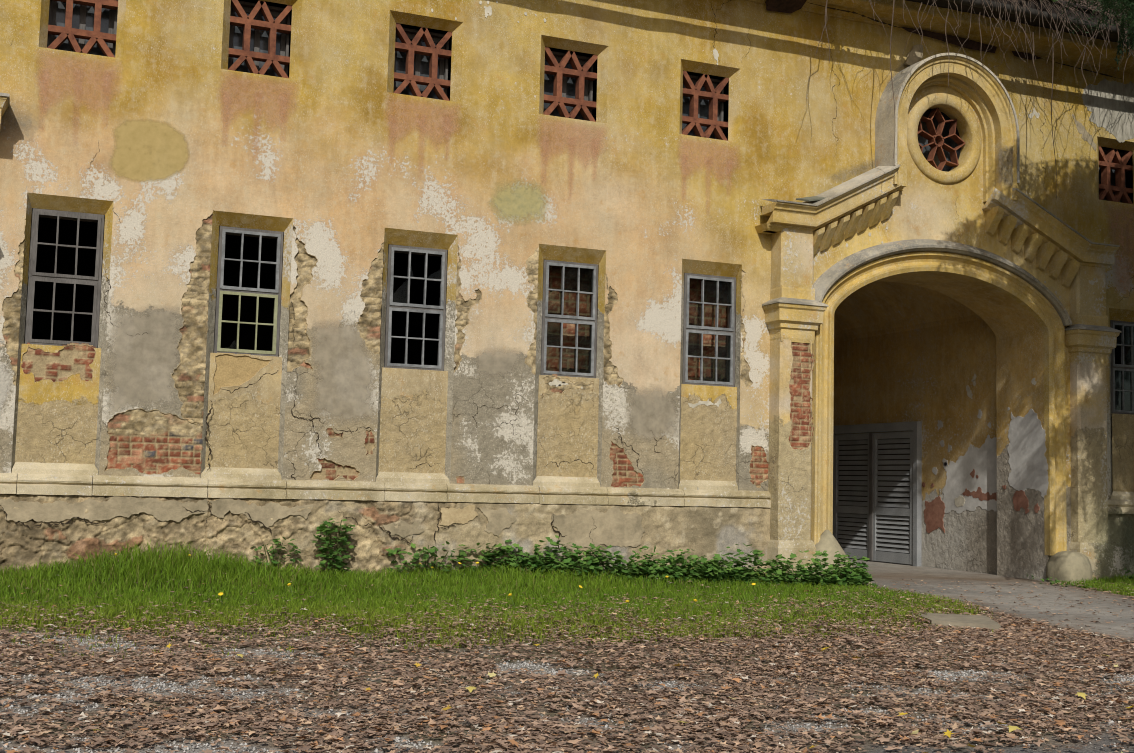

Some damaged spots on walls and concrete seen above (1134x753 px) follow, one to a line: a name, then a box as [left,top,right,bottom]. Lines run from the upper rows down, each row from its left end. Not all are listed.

peeling [1072,78,1134,151]
flaking render [2,219,96,386]
peeling [0,496,313,527]
flaking render [104,212,272,475]
flaking render [285,225,318,373]
crack [288,398,373,480]
flaking render [310,458,360,481]
flaking render [357,242,385,355]
peeling [439,505,478,526]
flaking render [609,441,645,488]
flaking render [789,340,815,450]
flaking render [922,374,1049,533]